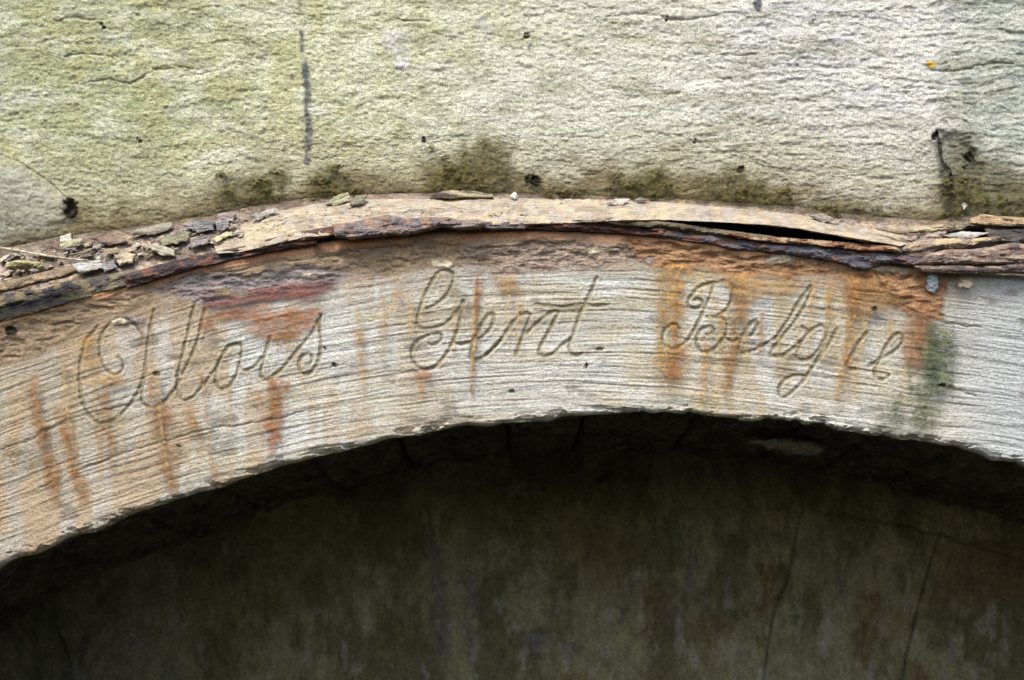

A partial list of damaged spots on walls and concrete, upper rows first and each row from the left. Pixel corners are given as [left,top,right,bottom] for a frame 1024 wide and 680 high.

spalling [39,213,236,274]
spalling [326,192,367,207]
rust [727,232,902,253]
crack [937,130,954,217]
leakage [947,137,1024,216]
rust [200,279,334,346]
spalling [0,236,972,362]
rust [655,263,689,383]
rust [700,273,799,400]
rust [810,274,935,399]
rust [26,376,87,502]
rust [259,379,290,453]